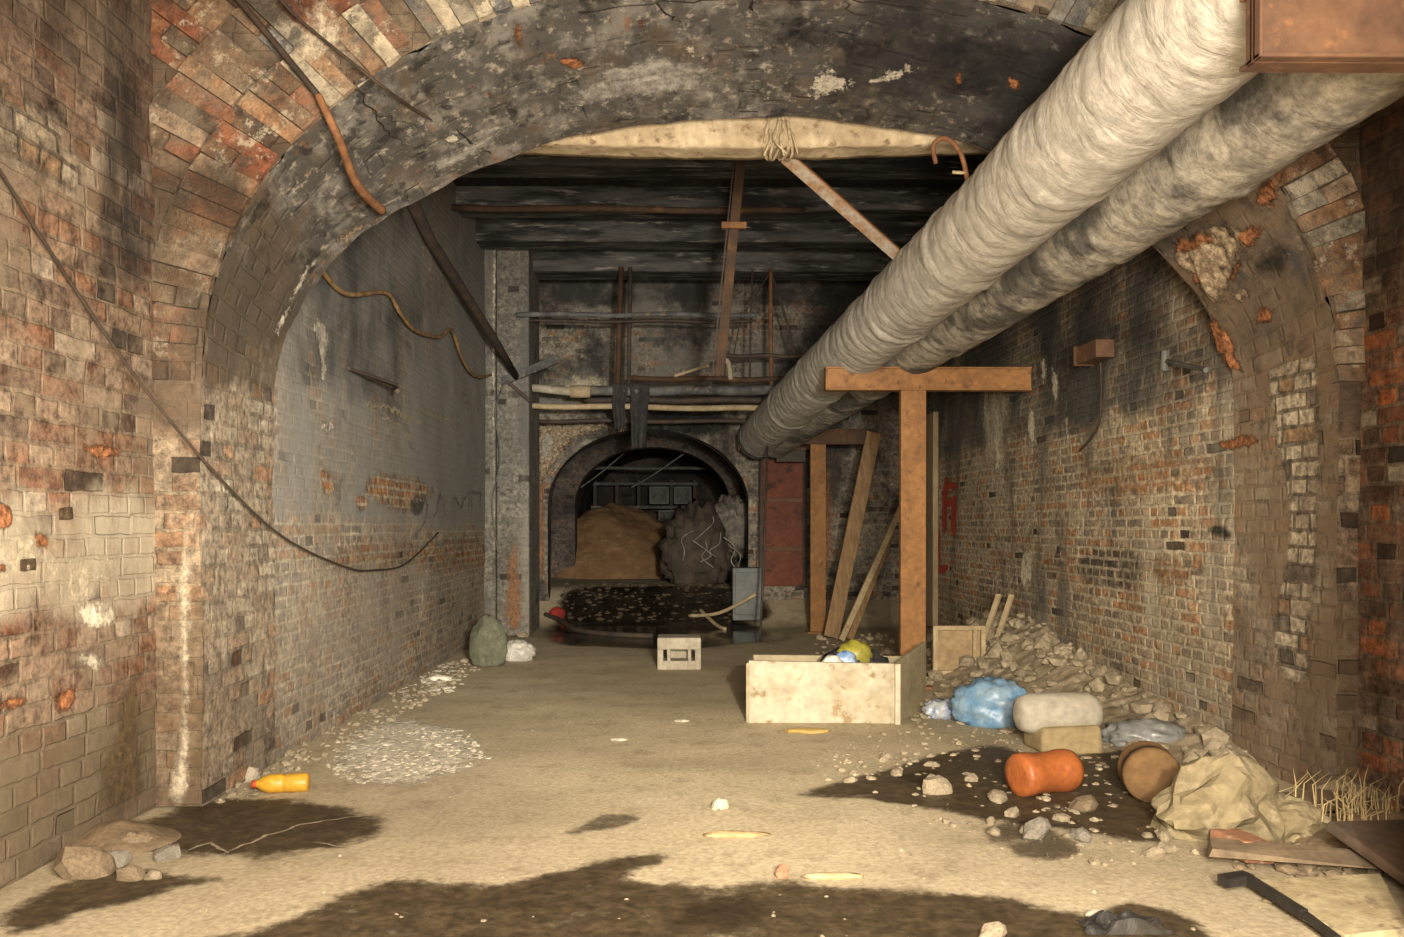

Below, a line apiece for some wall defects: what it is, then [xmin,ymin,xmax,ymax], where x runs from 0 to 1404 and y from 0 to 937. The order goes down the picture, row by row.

spalling [1256,173,1283,206]
peeling [355,472,433,513]
peeling [325,537,485,573]